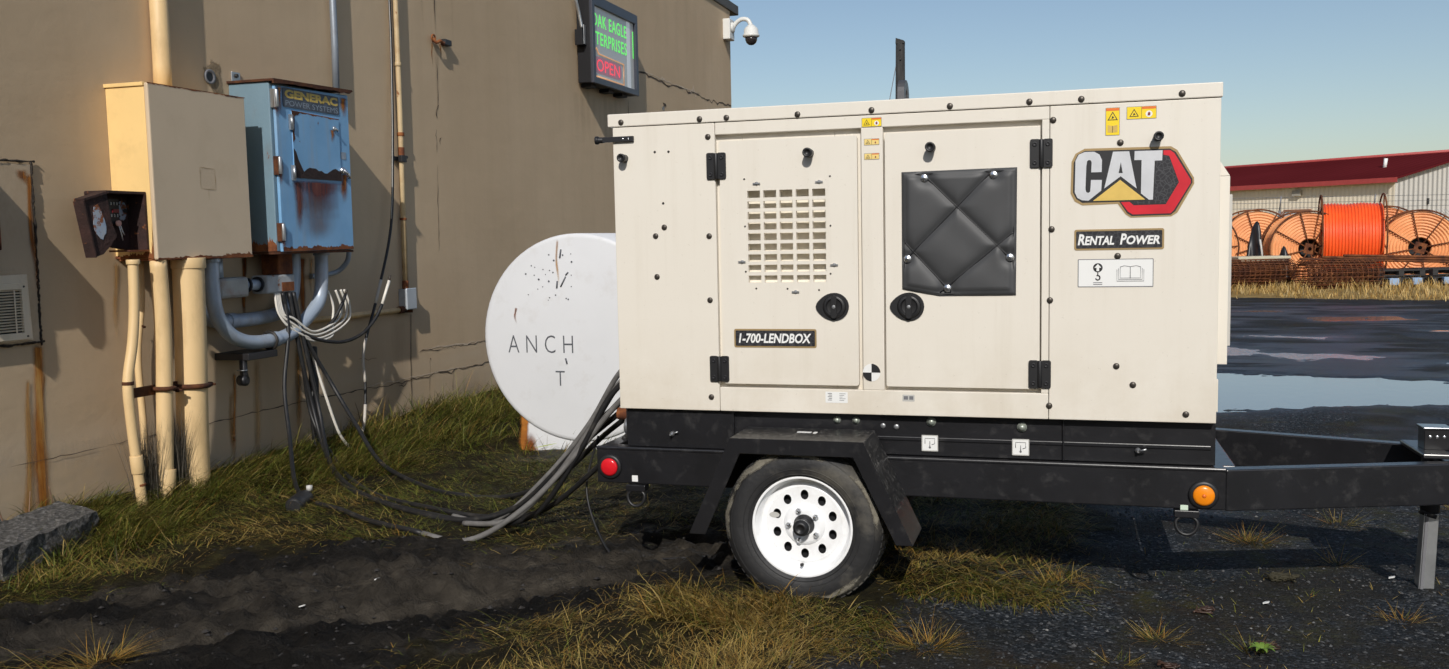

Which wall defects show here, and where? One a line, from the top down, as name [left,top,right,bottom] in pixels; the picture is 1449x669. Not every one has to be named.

crack [639,69,731,106]
corrosion [25,347,48,513]